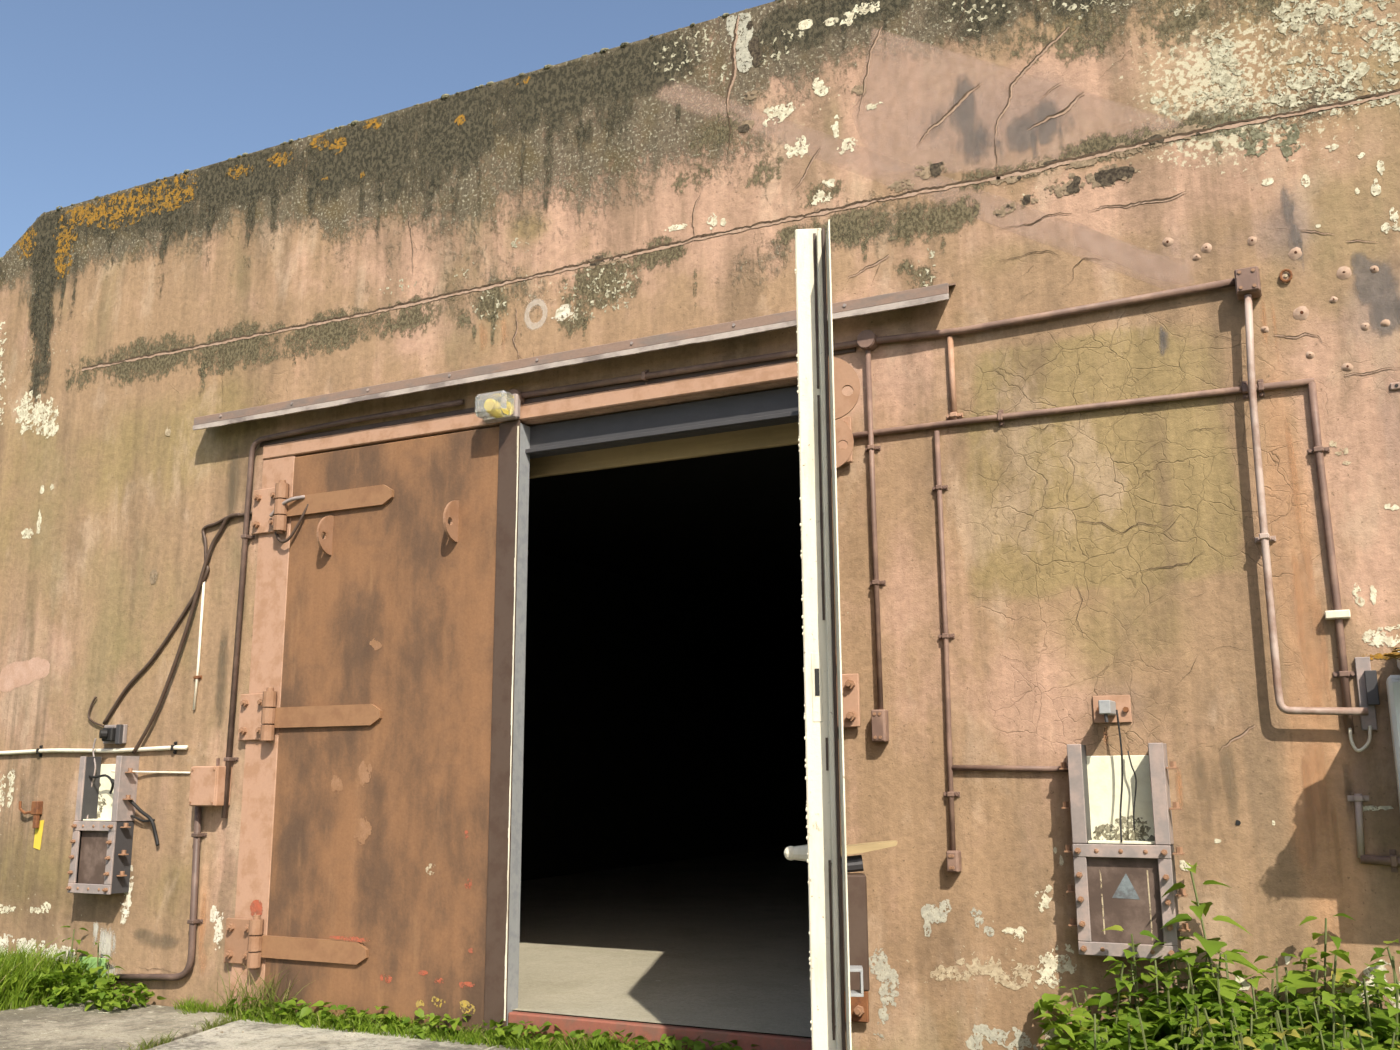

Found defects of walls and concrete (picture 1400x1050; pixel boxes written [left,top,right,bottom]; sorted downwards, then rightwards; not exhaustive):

damp [955,80,987,156]
damp [246,192,280,249]
crack [82,15,1400,405]
peeling [811,179,835,205]
damp [29,218,79,402]
damp [1352,255,1400,333]
peeling [0,322,59,438]
crack [1072,515,1180,546]
crack [1129,552,1203,597]
peeling [0,933,76,963]
peeling [930,944,1077,990]
peeling [965,1024,1058,1050]